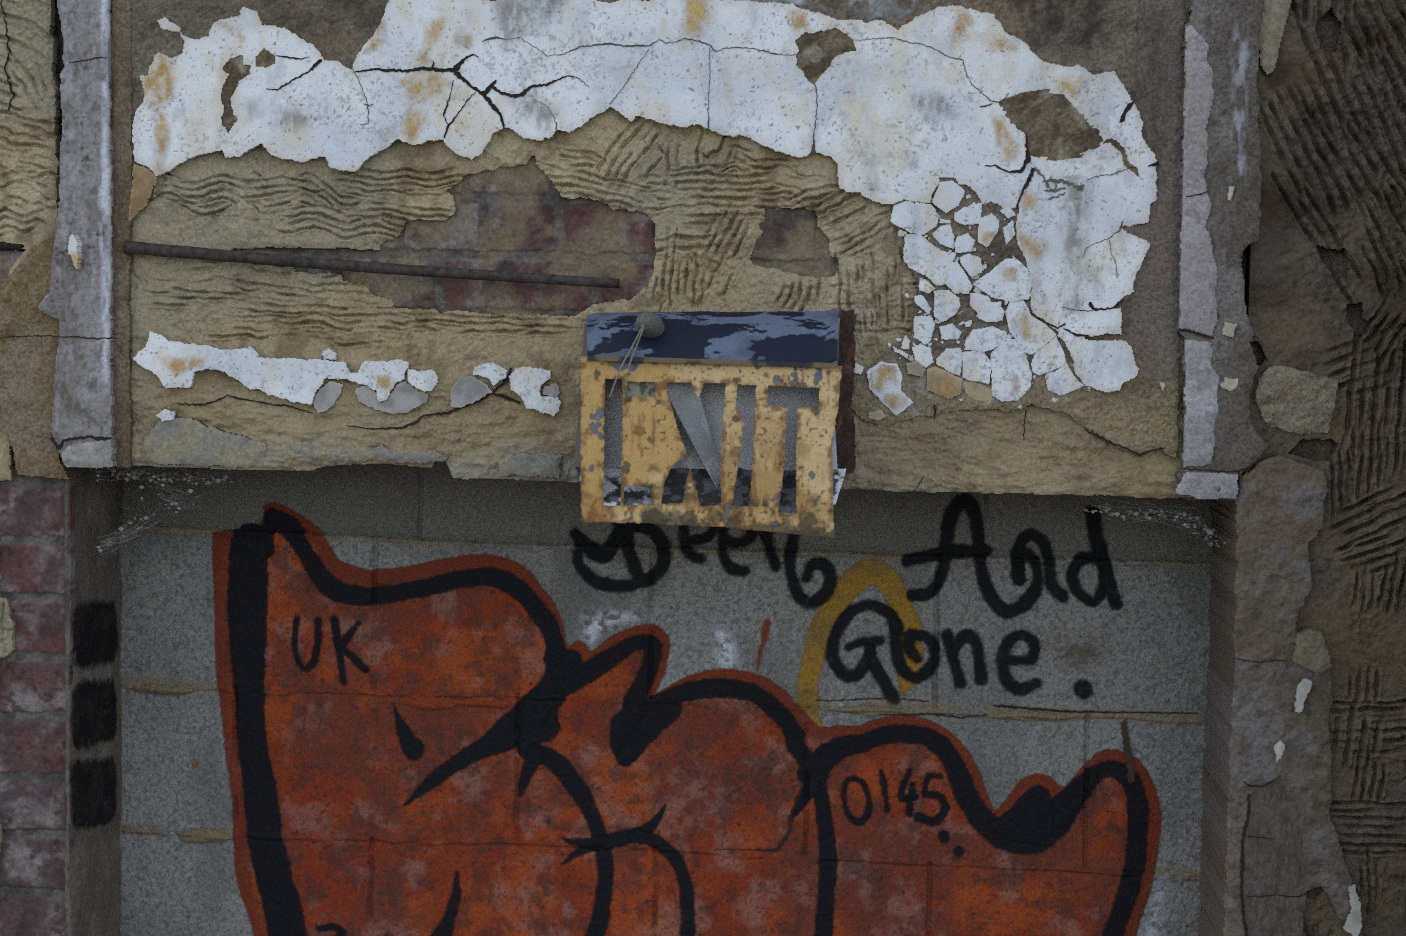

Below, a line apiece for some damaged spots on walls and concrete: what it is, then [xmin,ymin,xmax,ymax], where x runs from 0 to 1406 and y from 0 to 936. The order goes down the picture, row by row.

crack [266,36,797,138]
crack [811,84,819,153]
crack [857,37,1009,107]
crack [1119,101,1134,123]
peeling [1259,0,1292,75]
peeling [128,0,1158,392]
crack [854,135,1125,440]
flaking render [1316,245,1347,278]
peeling [133,331,561,416]
peeling [156,409,177,422]
crack [1085,429,1279,497]
flaking render [1288,438,1336,460]